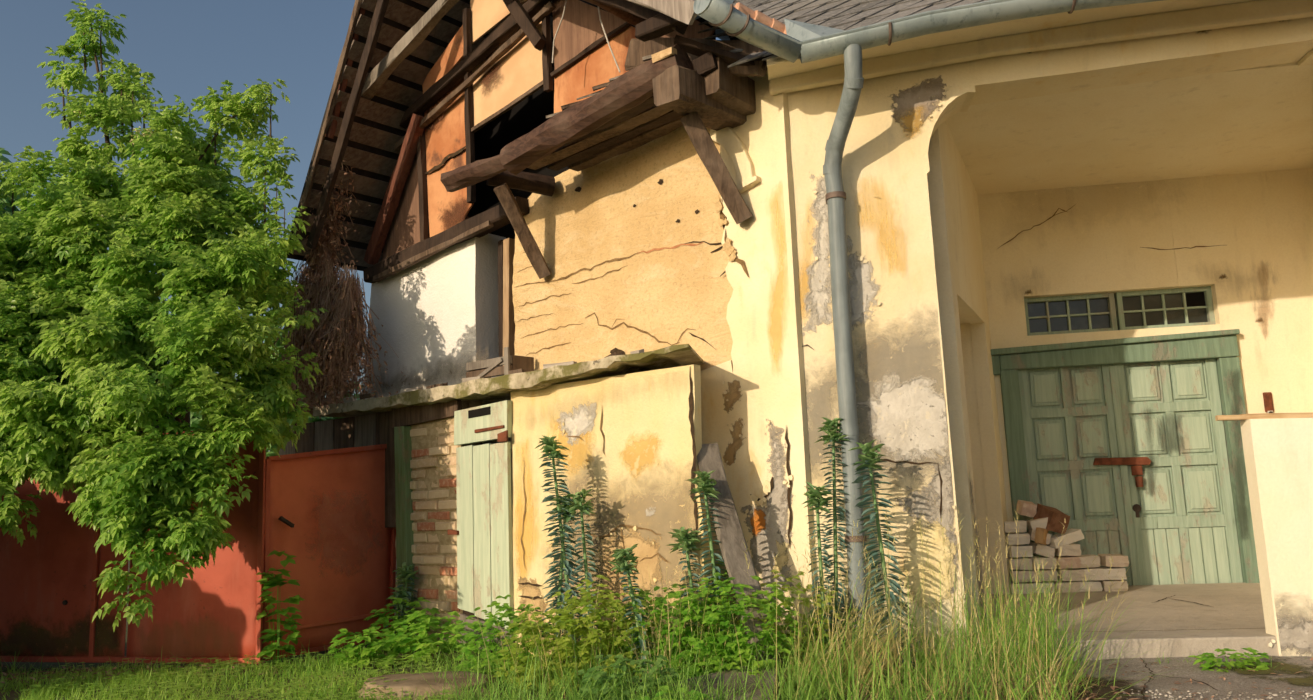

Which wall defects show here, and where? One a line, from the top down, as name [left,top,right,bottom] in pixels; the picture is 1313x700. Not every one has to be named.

flaking render [891,76,952,136]
crack [547,195,749,284]
crack [585,312,715,349]
flaking render [801,175,834,336]
flaking render [847,237,881,330]
crack [519,458,527,569]
crack [567,412,605,455]
damp [555,426,695,618]
crack [688,373,698,536]
flaking render [722,380,743,466]
flaking render [741,419,793,604]
flaking render [857,375,959,601]